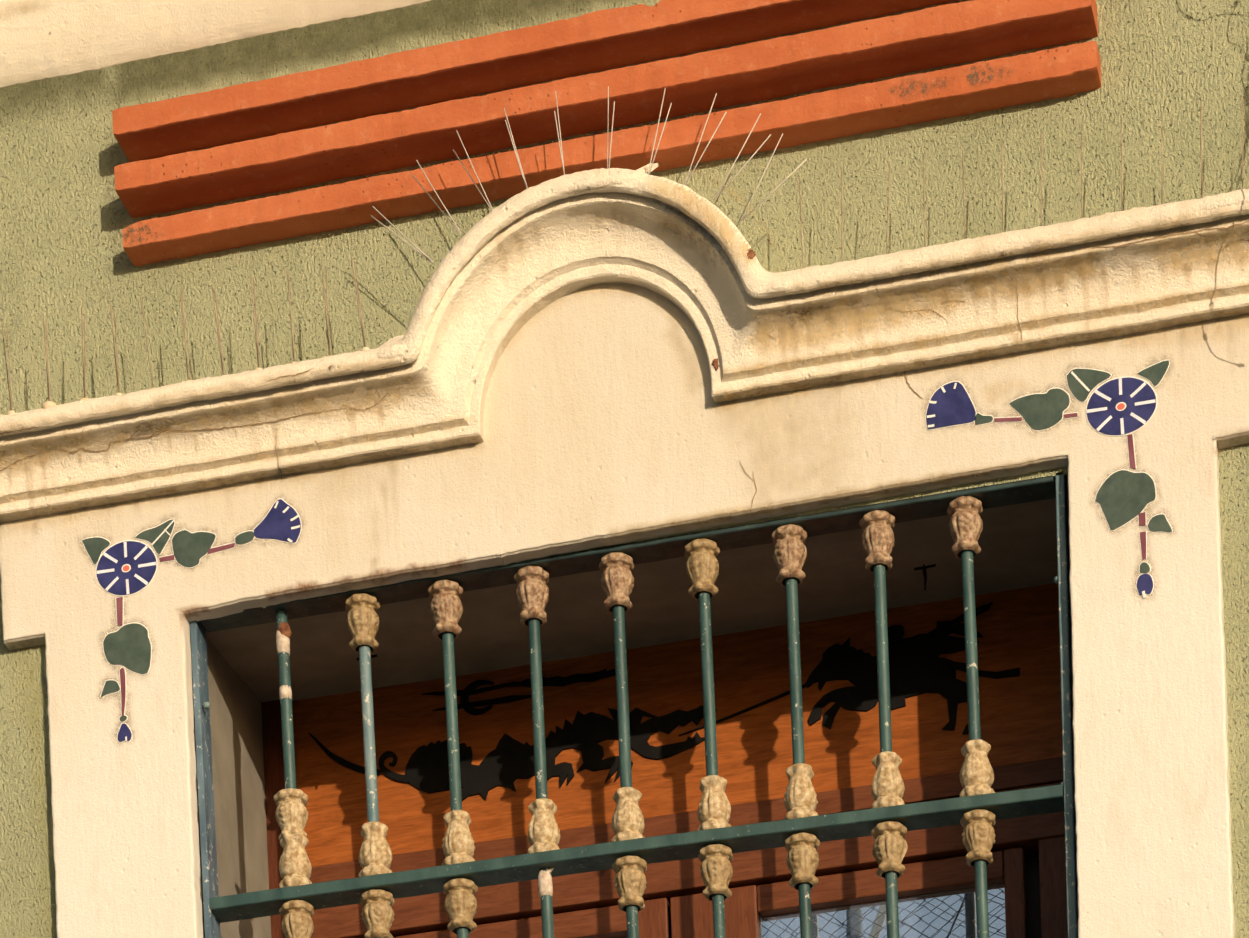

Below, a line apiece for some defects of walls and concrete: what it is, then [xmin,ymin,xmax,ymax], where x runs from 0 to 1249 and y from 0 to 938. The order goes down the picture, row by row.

water stain [931,243,1094,296]
water stain [756,285,961,345]
crack [0,390,392,483]